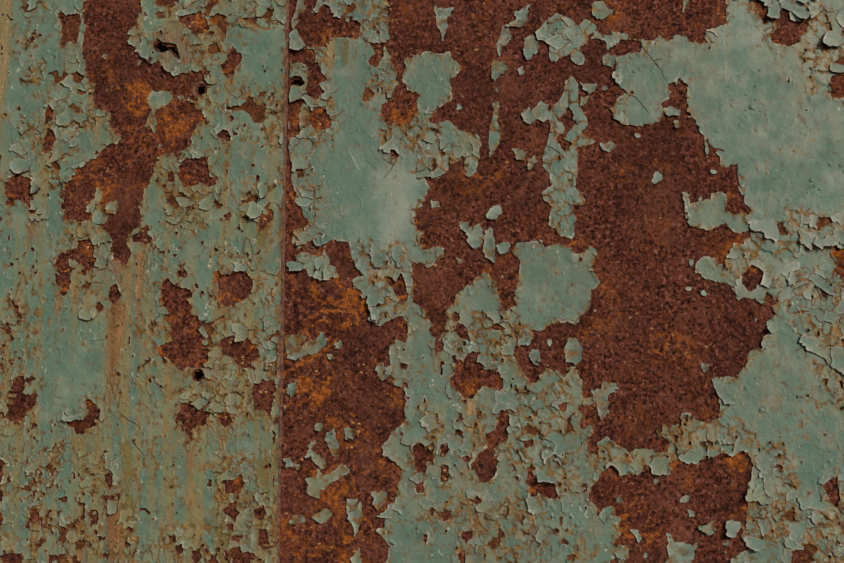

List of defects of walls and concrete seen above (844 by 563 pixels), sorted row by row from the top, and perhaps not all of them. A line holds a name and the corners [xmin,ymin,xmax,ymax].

peeling [797,0,844,73]
rust [0,162,50,223]
rust [50,0,238,315]
peeling [159,146,283,235]
peeling [209,75,349,246]
rust [153,0,778,563]
peeling [726,212,844,410]
rust [0,369,42,435]
rust [57,393,106,449]
peeling [180,314,280,425]
peeling [676,420,844,563]
rust [819,476,844,508]